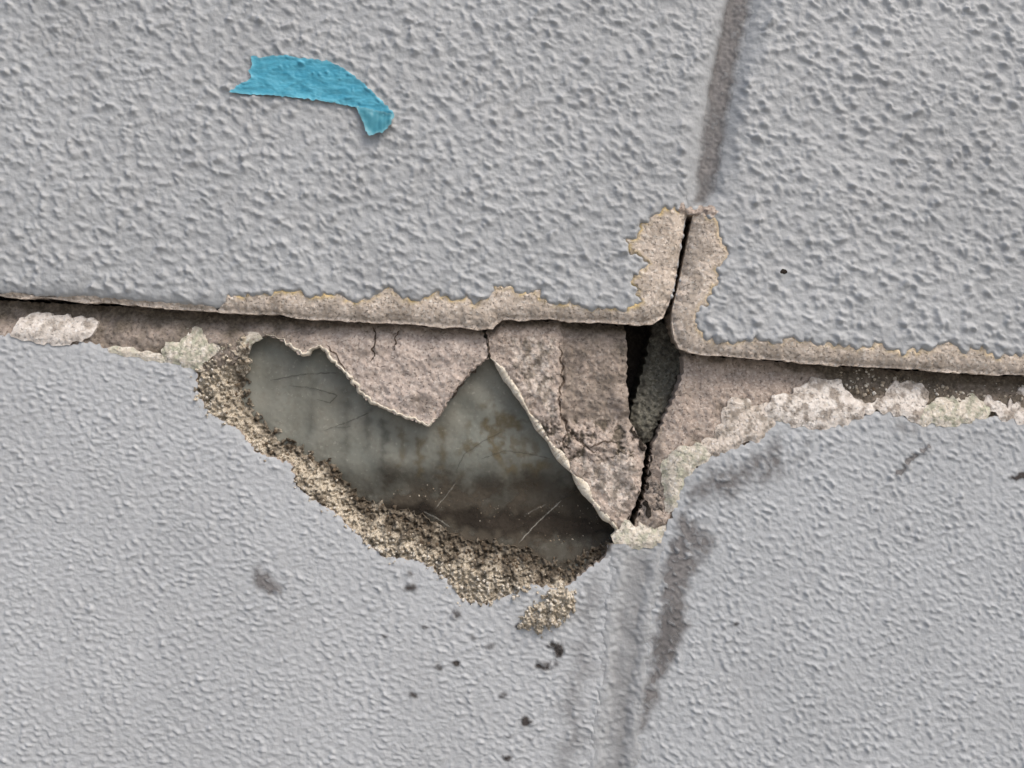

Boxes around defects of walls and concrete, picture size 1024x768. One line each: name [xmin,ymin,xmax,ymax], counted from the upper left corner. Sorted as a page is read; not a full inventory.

spalling [0,203,1024,638]
water stain [692,447,780,495]
water stain [645,515,713,713]